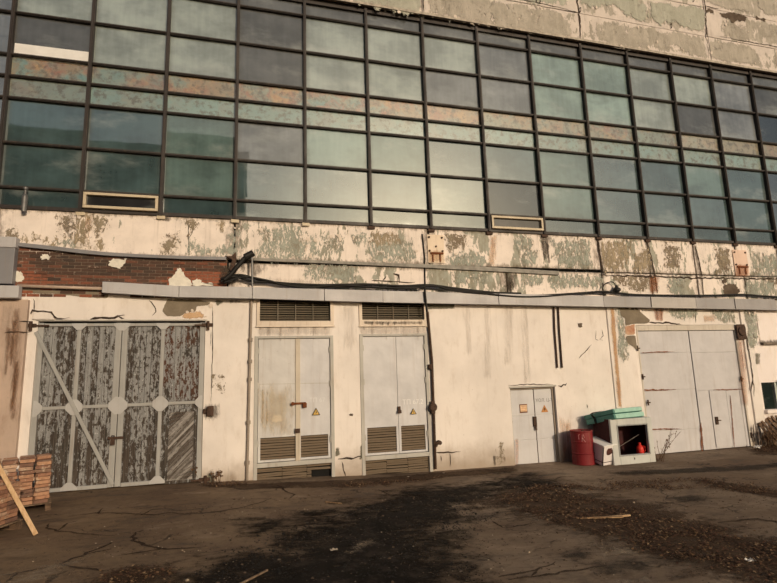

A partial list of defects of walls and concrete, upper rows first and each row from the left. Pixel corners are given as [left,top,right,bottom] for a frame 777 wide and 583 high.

flaking render [5,211,241,298]